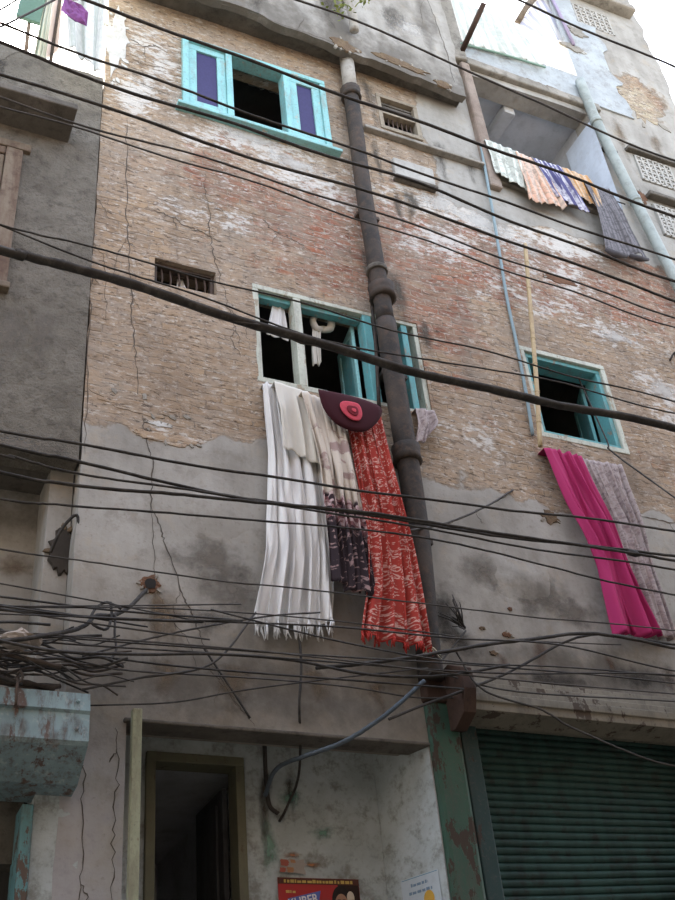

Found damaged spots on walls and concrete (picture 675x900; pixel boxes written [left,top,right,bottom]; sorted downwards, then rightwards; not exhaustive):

spalling [329,36,453,92]
flaking render [613,75,671,133]
crack [84,129,140,443]
crack [156,174,247,357]
flaking render [132,420,202,448]
crack [142,416,254,724]
flaking render [540,509,561,526]
crack [79,765,89,900]
crack [109,728,120,898]